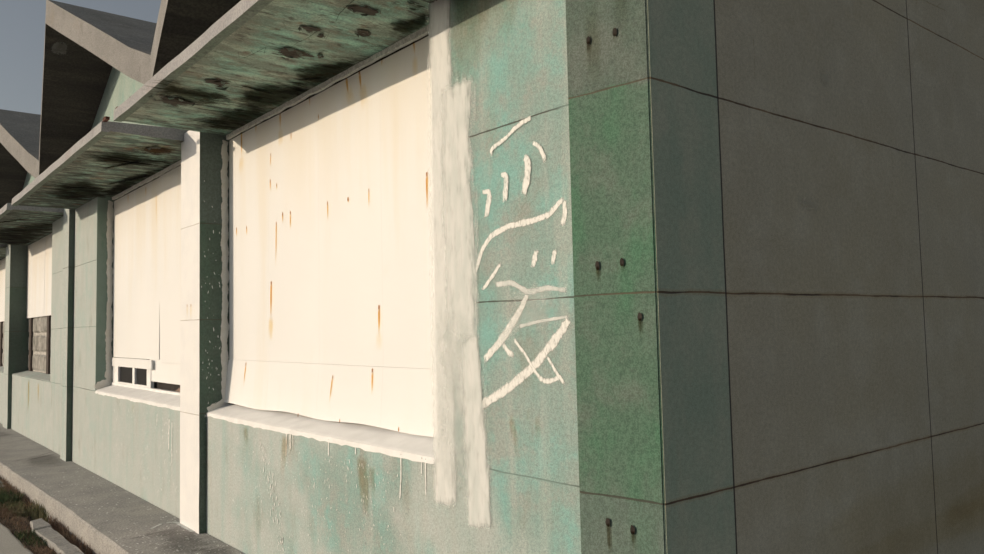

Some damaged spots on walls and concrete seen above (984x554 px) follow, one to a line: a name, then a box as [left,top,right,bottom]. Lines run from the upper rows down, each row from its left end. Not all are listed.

mould [392,9,430,33]
mould [153,60,362,130]
mould [46,152,178,201]